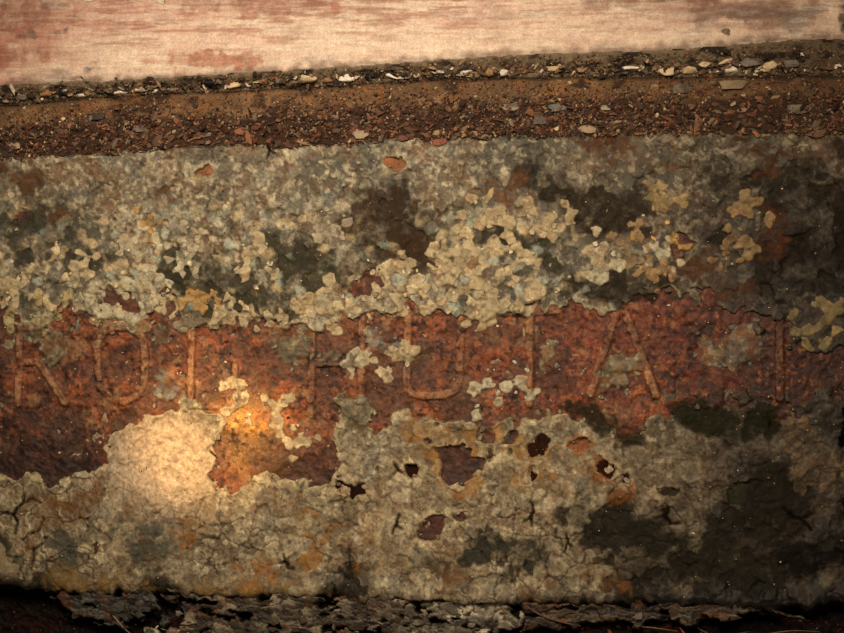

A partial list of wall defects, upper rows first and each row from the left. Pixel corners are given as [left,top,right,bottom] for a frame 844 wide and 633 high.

peeling [0,205,421,384]
peeling [367,188,579,332]
peeling [787,295,844,352]
corrosion [0,233,844,496]
peeling [219,376,253,426]
peeling [260,393,322,463]
spalling [428,339,560,487]
crack [0,495,46,569]
crack [525,502,535,525]
crack [658,507,681,525]
peeling [44,587,812,633]
crack [400,599,541,610]